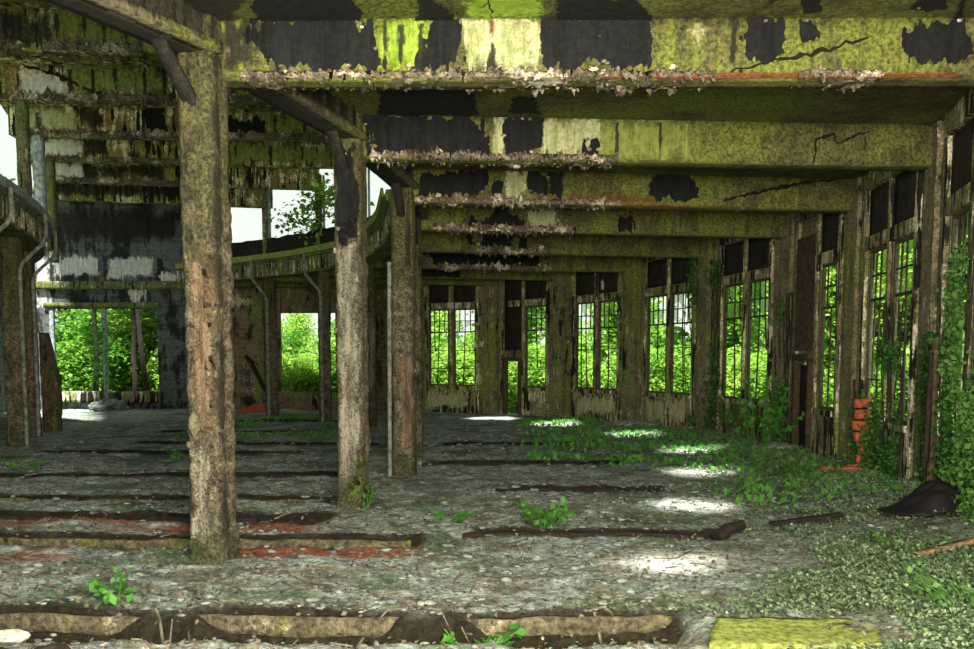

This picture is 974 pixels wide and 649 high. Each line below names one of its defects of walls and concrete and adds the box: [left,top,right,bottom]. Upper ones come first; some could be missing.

water stain [0,10,127,48]
water stain [383,20,424,70]
water stain [462,18,541,72]
water stain [730,20,738,62]
crack [730,37,869,73]
water stain [18,66,117,98]
crack [723,131,870,202]
peeling [228,0,974,482]